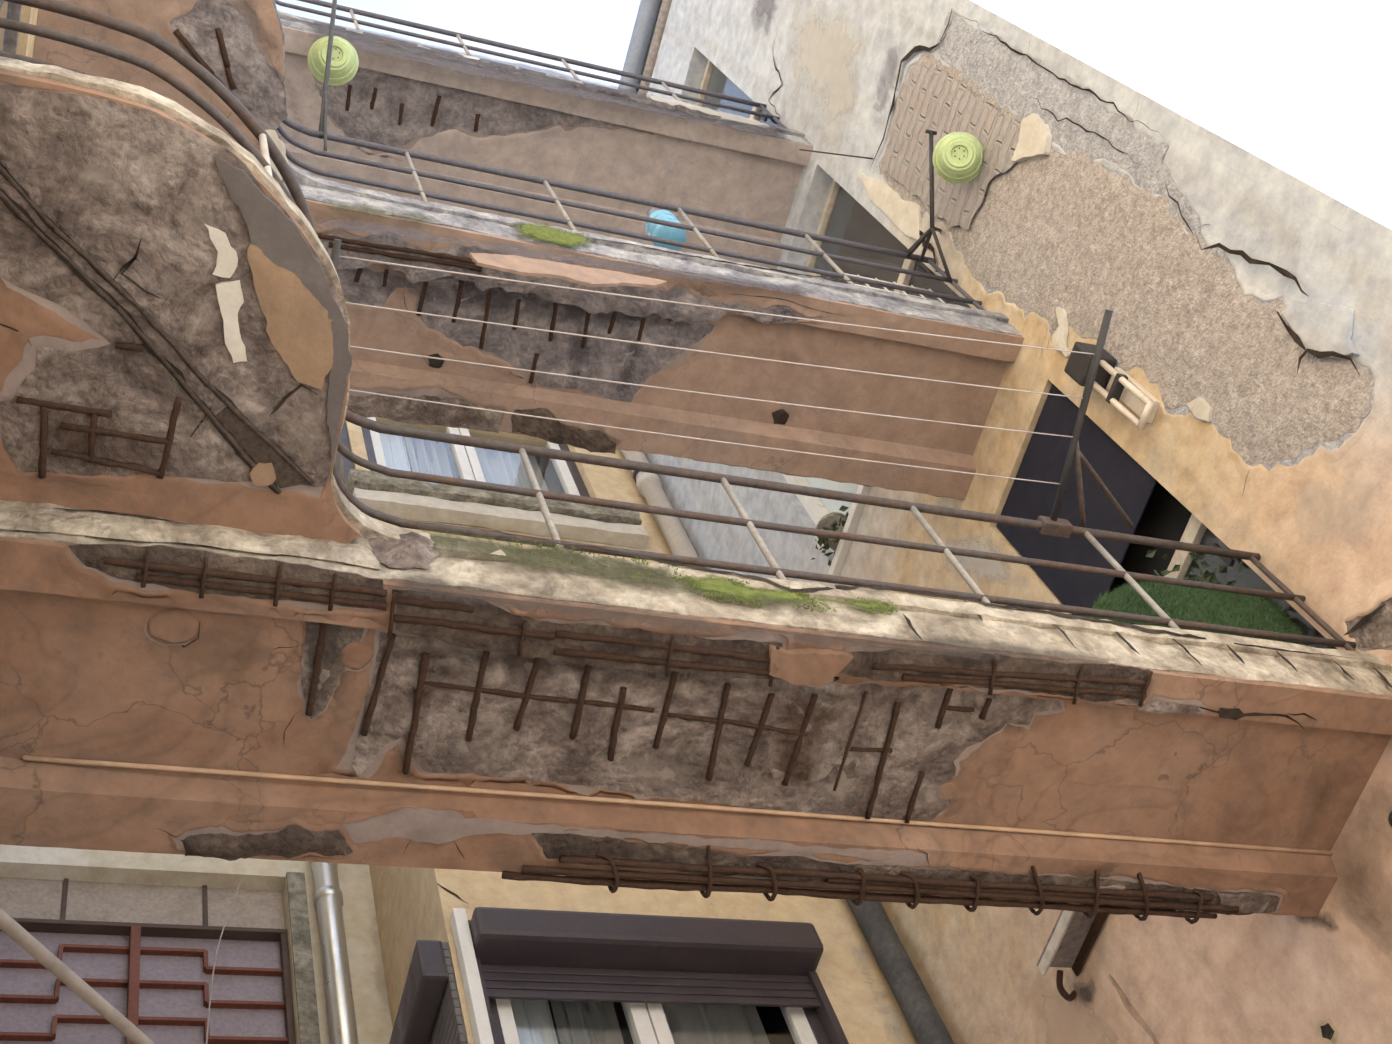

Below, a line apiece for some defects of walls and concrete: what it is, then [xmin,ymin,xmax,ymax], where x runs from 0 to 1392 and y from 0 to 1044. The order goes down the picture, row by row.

spalling [158,0,289,180]
spalling [300,58,659,162]
flaking render [860,3,1383,496]
spalling [0,80,1213,823]
flaking render [1334,579,1392,669]
spalling [156,805,1288,924]